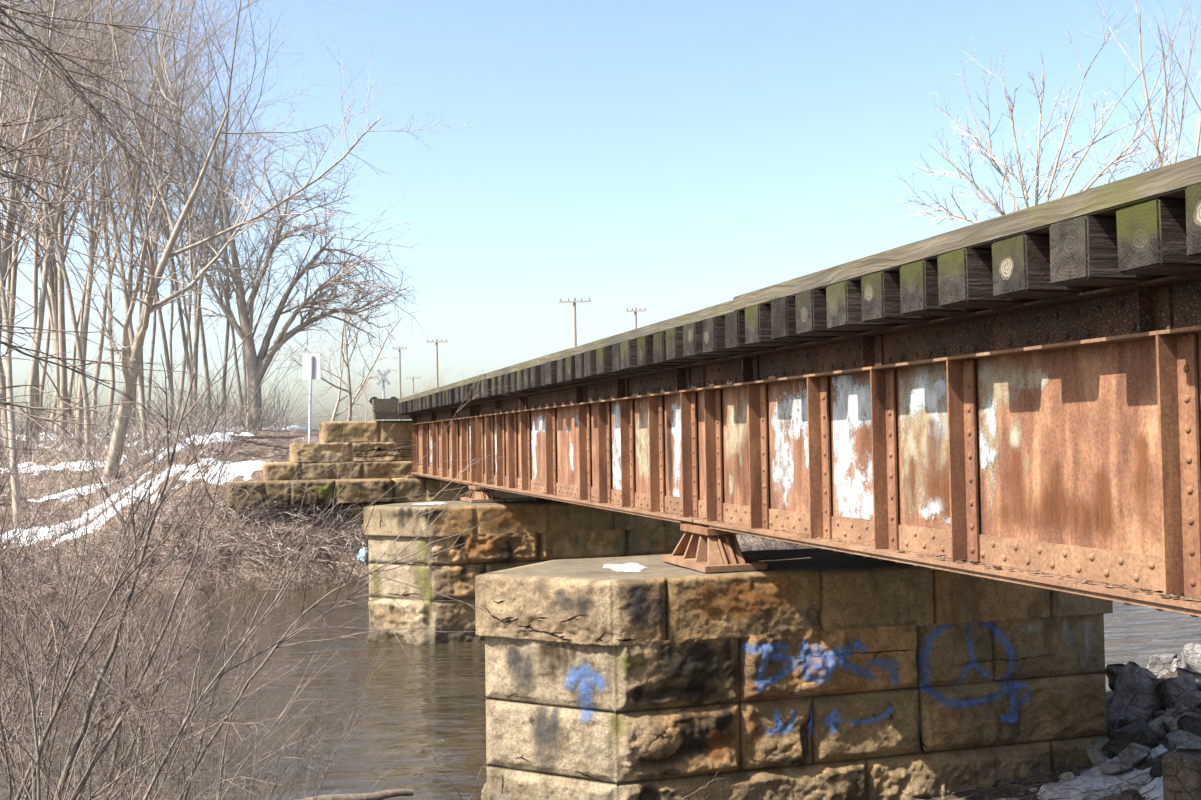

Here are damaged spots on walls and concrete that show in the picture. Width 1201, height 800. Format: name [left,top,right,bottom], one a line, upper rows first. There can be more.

peeling [771,382,809,504]
peeling [832,373,873,520]
peeling [899,364,950,524]
corrosion [928,420,950,515]
corrosion [1136,436,1146,499]
crack [484,601,634,641]